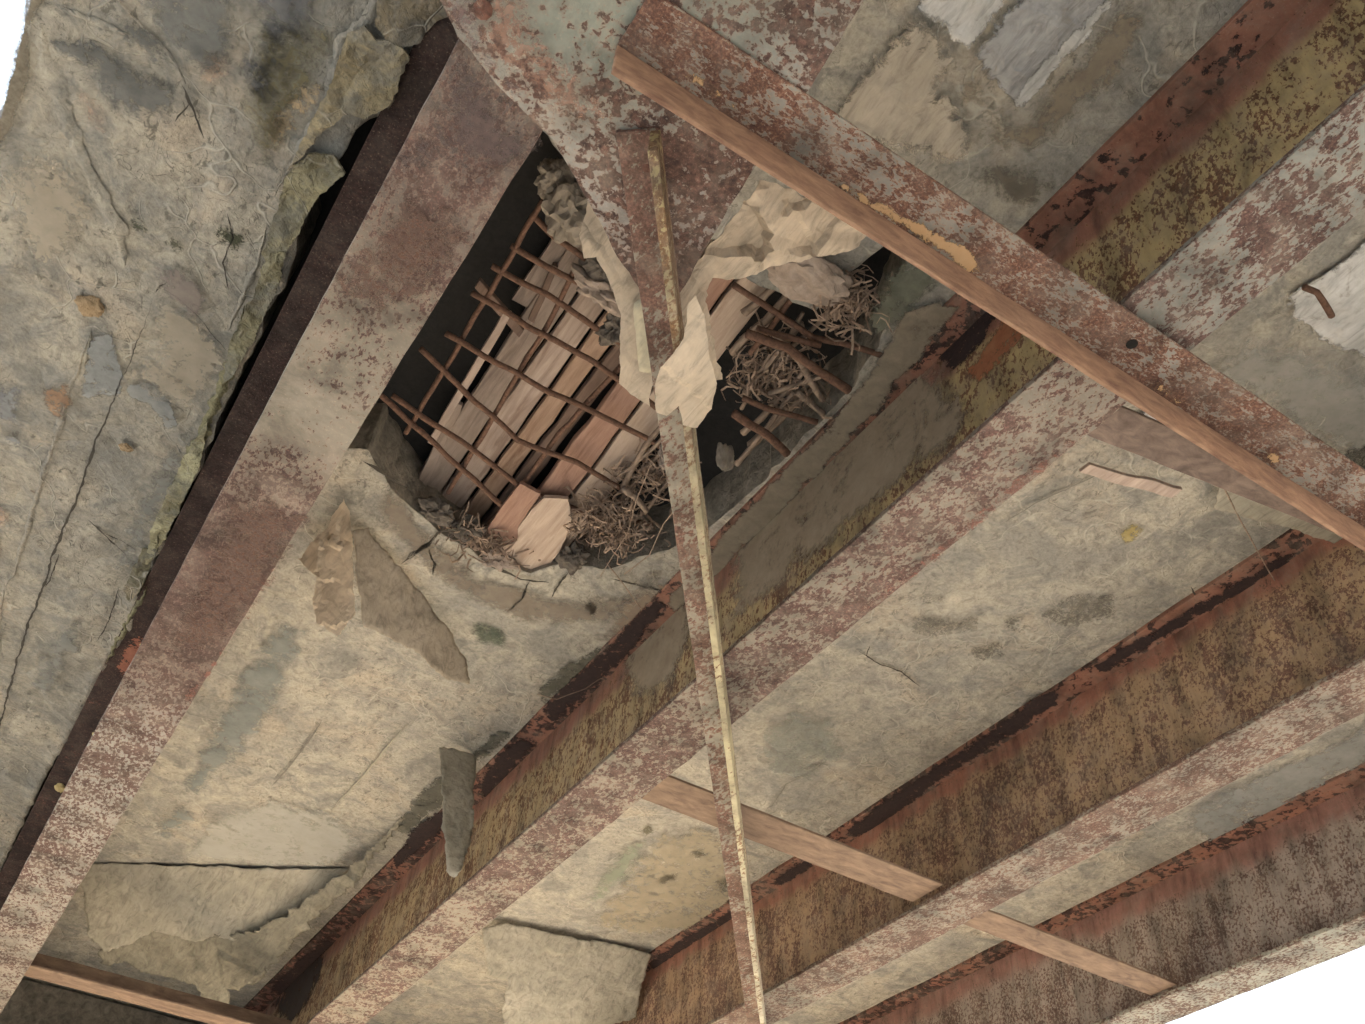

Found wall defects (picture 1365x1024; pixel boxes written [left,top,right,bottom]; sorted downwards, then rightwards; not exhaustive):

leakage [50,0,234,114]
leakage [242,0,329,159]
spalling [379,199,665,526]
spalling [732,282,883,394]
rust [937,312,1022,382]
crack [0,283,226,725]
peeling [716,442,735,473]
rust [543,601,664,725]
rust [1094,553,1294,672]
rust [846,688,1060,837]
rust [392,811,443,869]
rust [272,940,333,1022]